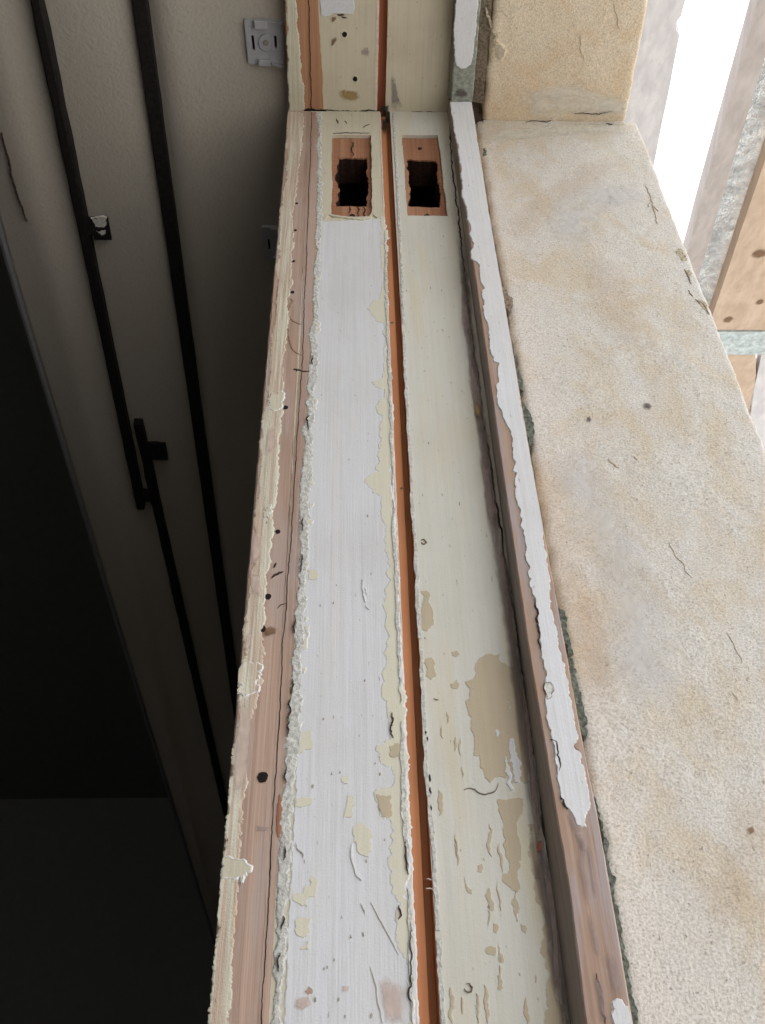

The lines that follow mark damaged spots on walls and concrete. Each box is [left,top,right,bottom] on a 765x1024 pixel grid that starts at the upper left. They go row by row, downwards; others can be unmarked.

peeling [208,0,420,1024]
peeling [429,774,443,815]
peeling [441,653,564,1024]
peeling [450,102,591,828]